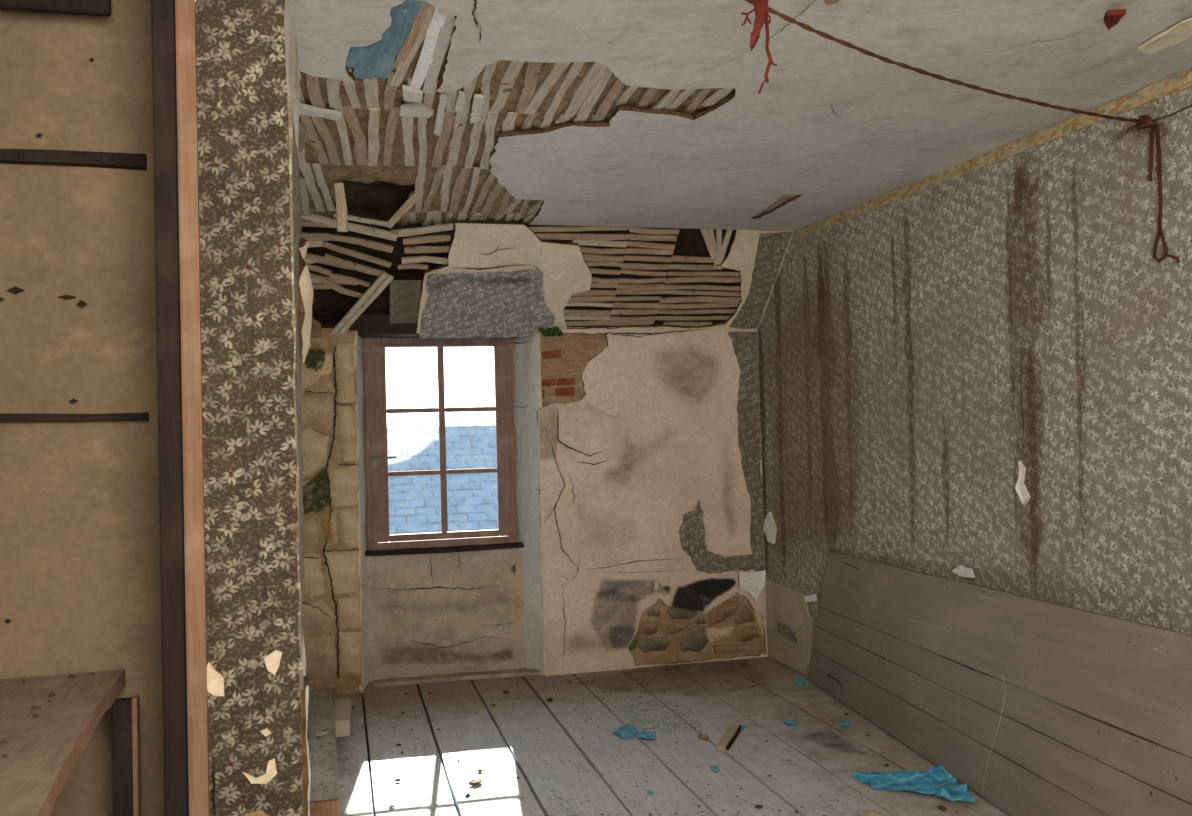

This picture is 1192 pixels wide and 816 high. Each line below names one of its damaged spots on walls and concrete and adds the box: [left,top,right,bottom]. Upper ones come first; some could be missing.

crack [472,0,482,42]
peeling [1104,8,1126,30]
peeling [1138,18,1192,54]
flaking render [298,0,741,816]
crack [302,346,358,678]
crack [516,405,688,666]
leakage [599,579,735,612]
flaking render [628,570,766,666]